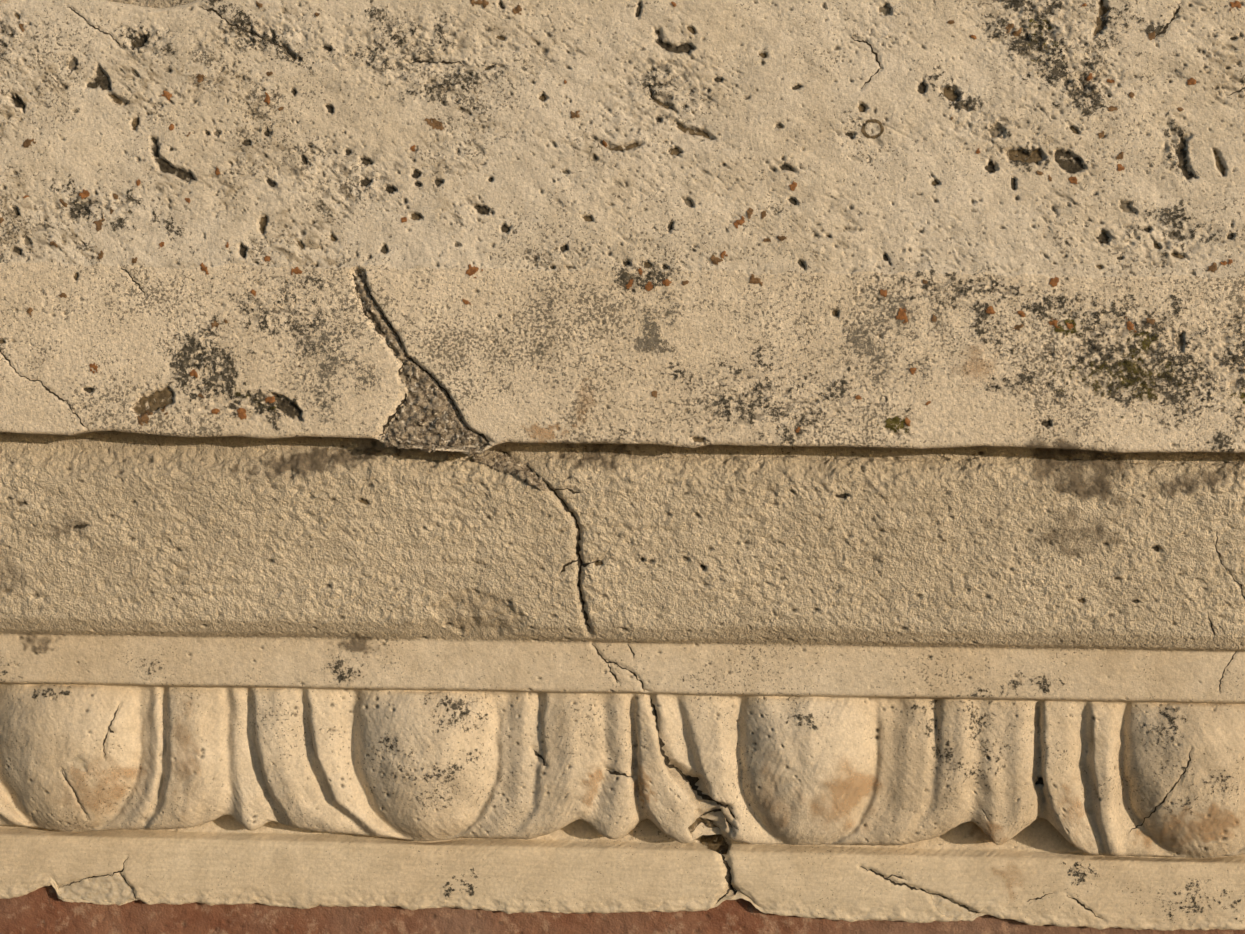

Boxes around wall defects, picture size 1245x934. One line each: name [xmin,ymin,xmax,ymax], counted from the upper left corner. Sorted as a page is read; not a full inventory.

crack [0,350,87,428]
crack [352,273,737,904]
crack [1129,747,1193,833]
crack [861,866,979,913]